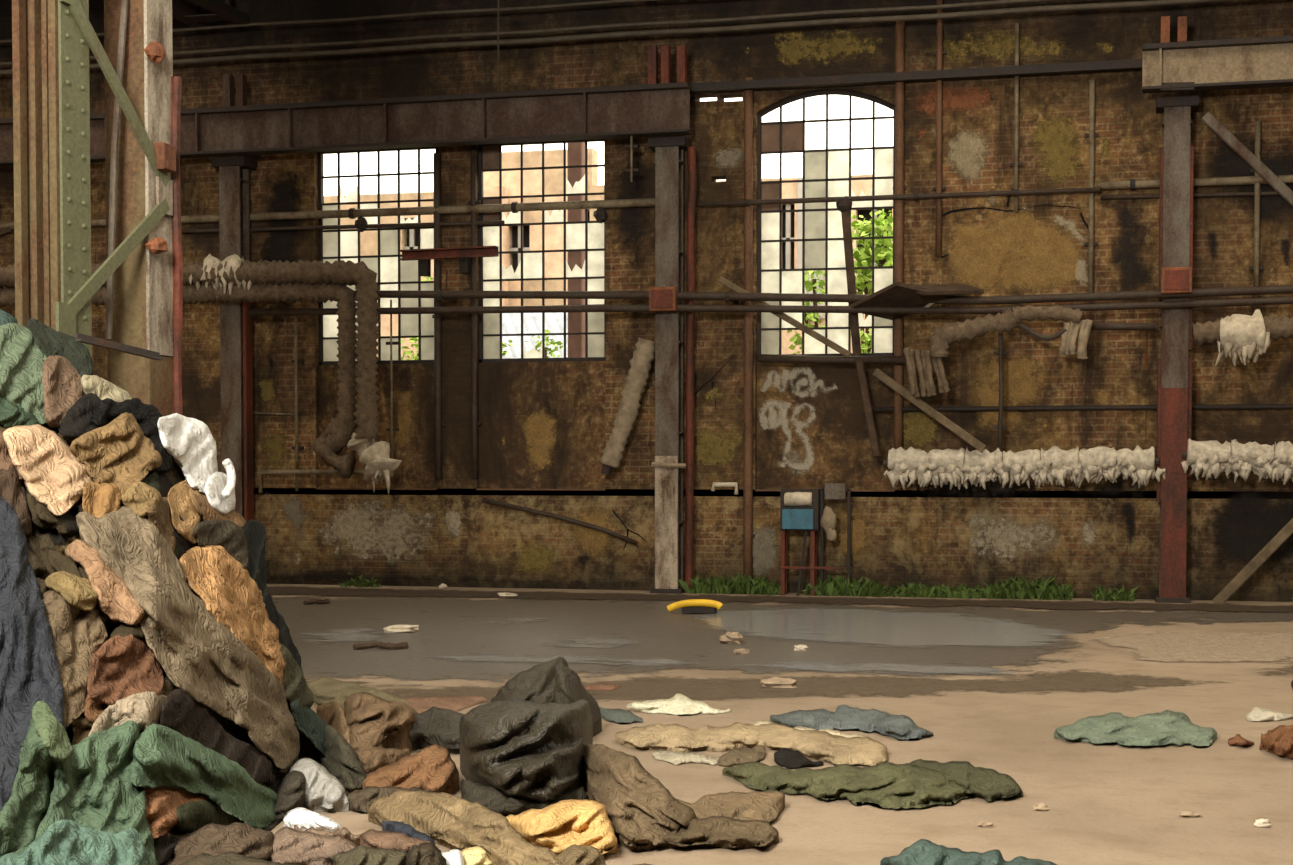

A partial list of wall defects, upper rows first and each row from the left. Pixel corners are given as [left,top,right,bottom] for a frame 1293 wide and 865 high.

peeling [949,132,987,179]
peeling [948,196,1088,292]
water stain [1108,199,1150,302]